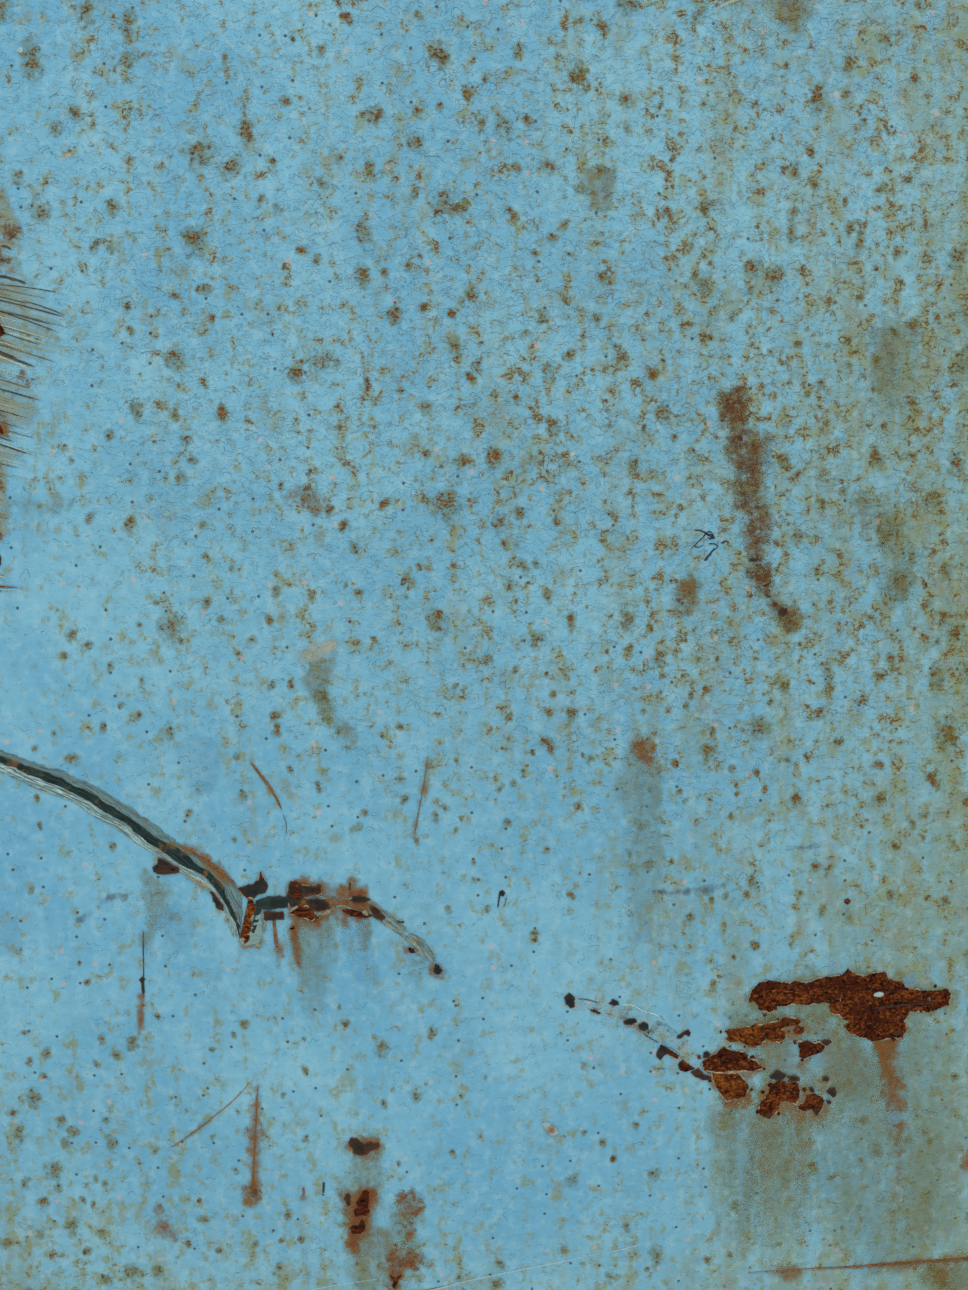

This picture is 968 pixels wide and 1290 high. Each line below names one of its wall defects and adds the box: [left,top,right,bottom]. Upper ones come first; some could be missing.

rust [718,386,804,631]
spalling [0,750,443,979]
rust [272,920,301,967]
rust [679,969,952,1181]
rust [235,1099,263,1206]
rust [346,1137,381,1159]
rust [340,1187,431,1290]